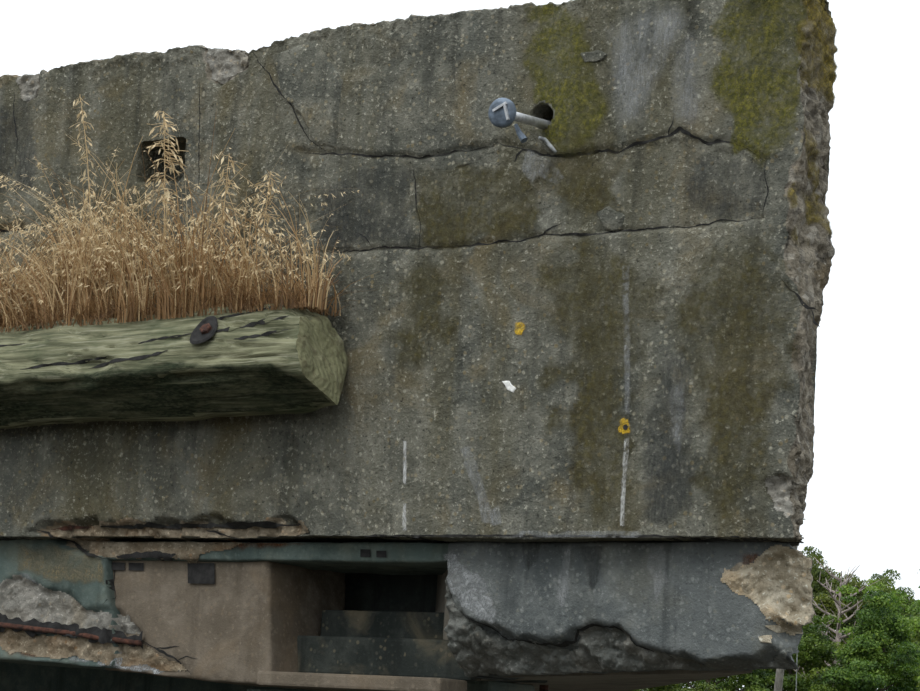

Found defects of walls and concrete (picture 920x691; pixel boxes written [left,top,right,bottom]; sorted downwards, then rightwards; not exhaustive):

spalling [0,575,187,674]
spalling [444,553,797,677]
spalling [721,545,814,643]